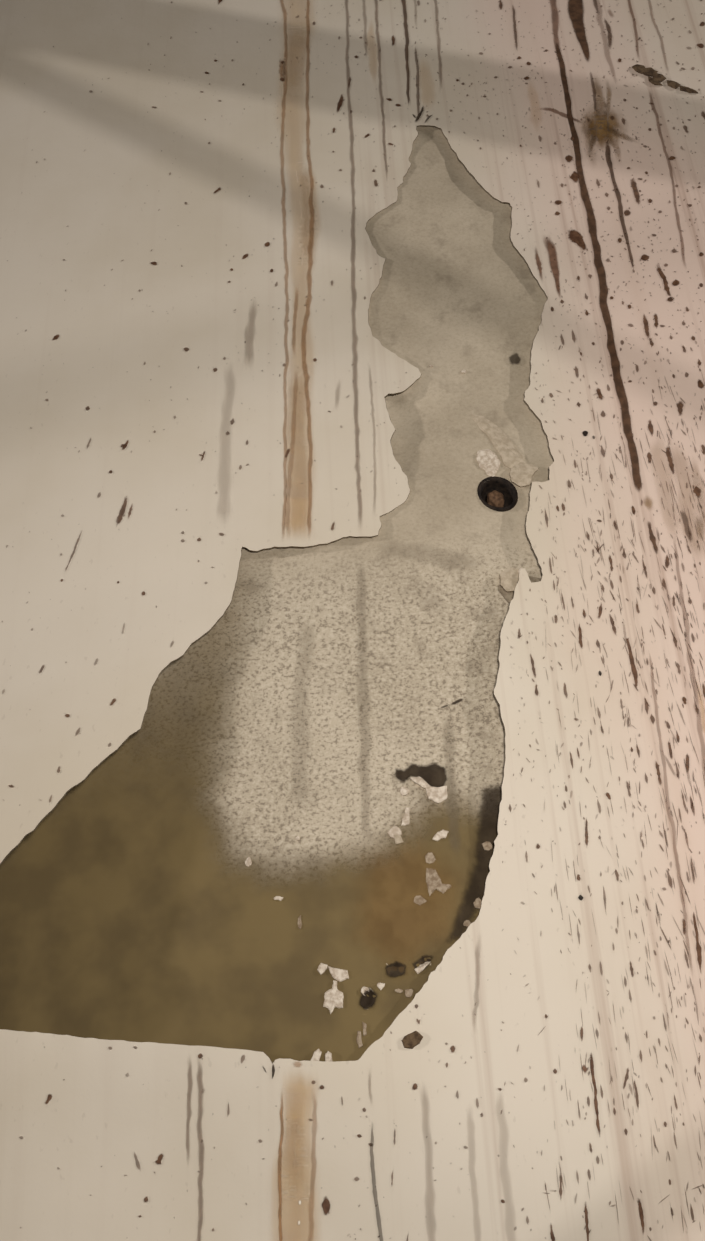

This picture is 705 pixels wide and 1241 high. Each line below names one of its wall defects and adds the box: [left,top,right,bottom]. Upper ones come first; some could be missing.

corrosion [302,0,314,528]
water stain [536,240,564,311]
corrosion [546,108,618,144]
water stain [545,0,679,490]
water stain [628,307,695,352]
water stain [117,498,132,523]
peeling [0,125,554,1061]
water stain [549,533,689,784]
water stain [643,523,692,606]
water stain [0,687,498,1241]